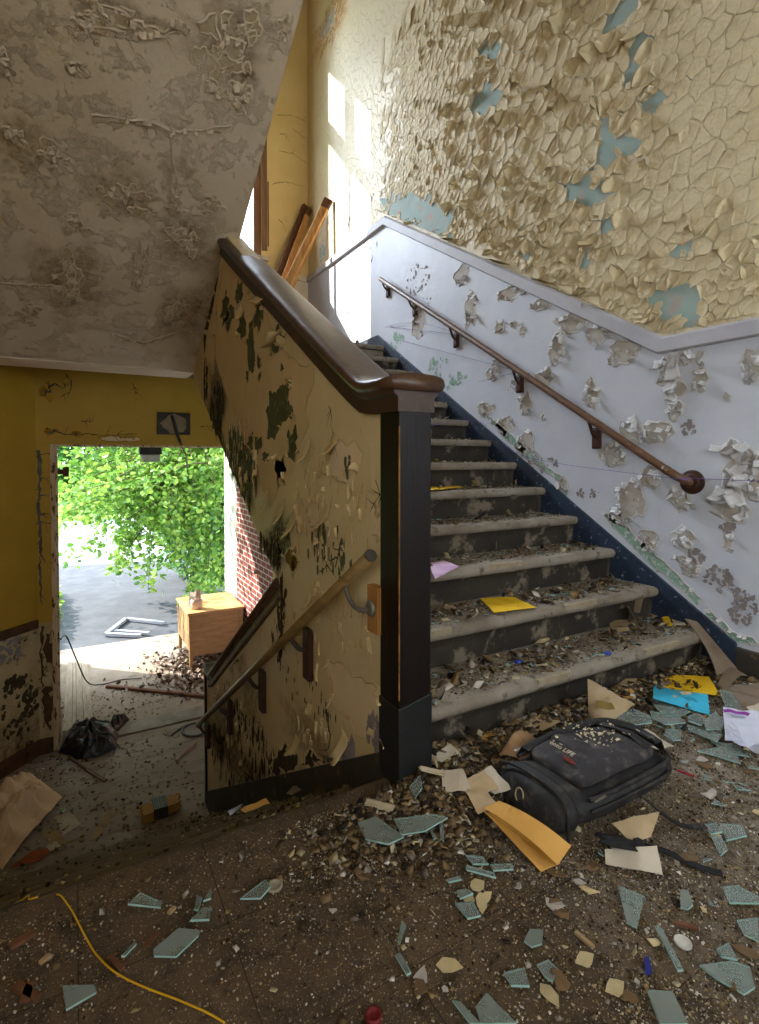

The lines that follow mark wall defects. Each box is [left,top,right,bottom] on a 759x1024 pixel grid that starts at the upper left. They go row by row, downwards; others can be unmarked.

peeling [337,0,759,390]
peeling [212,259,380,578]
peeling [477,380,599,499]
peeling [582,375,602,411]
peeling [597,349,711,467]
peeling [39,633,53,735]
peeling [213,609,384,777]
spalling [430,626,452,637]
spalling [488,560,523,570]
spalling [563,598,597,610]
peeling [600,436,759,646]